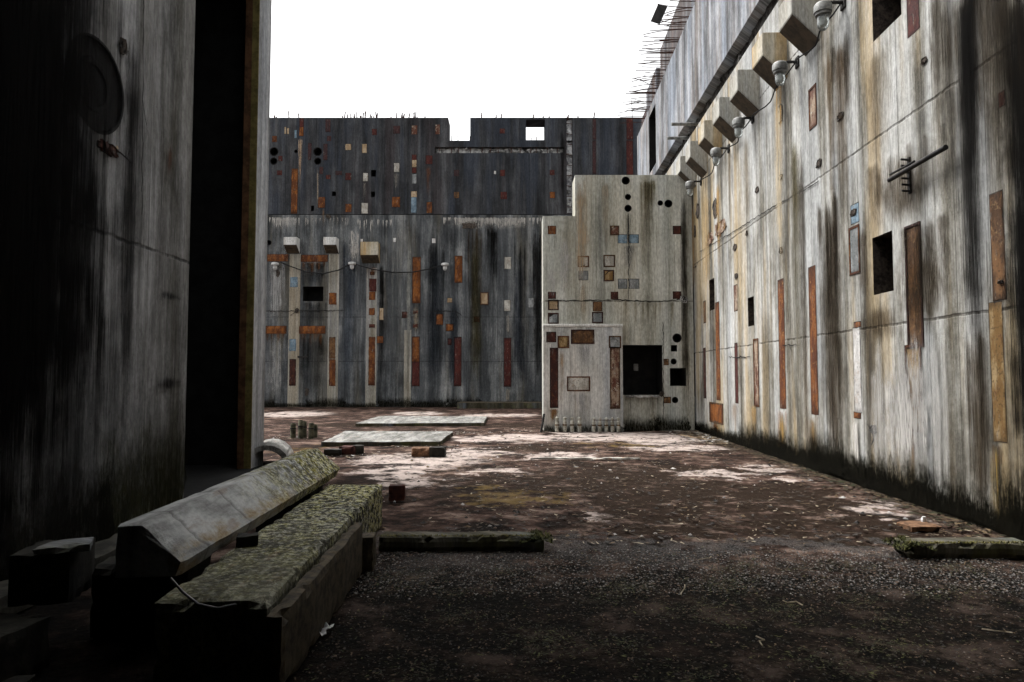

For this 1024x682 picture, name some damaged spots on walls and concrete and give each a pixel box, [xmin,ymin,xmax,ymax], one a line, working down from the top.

leakage [443,217,568,370]
leakage [542,0,1024,541]